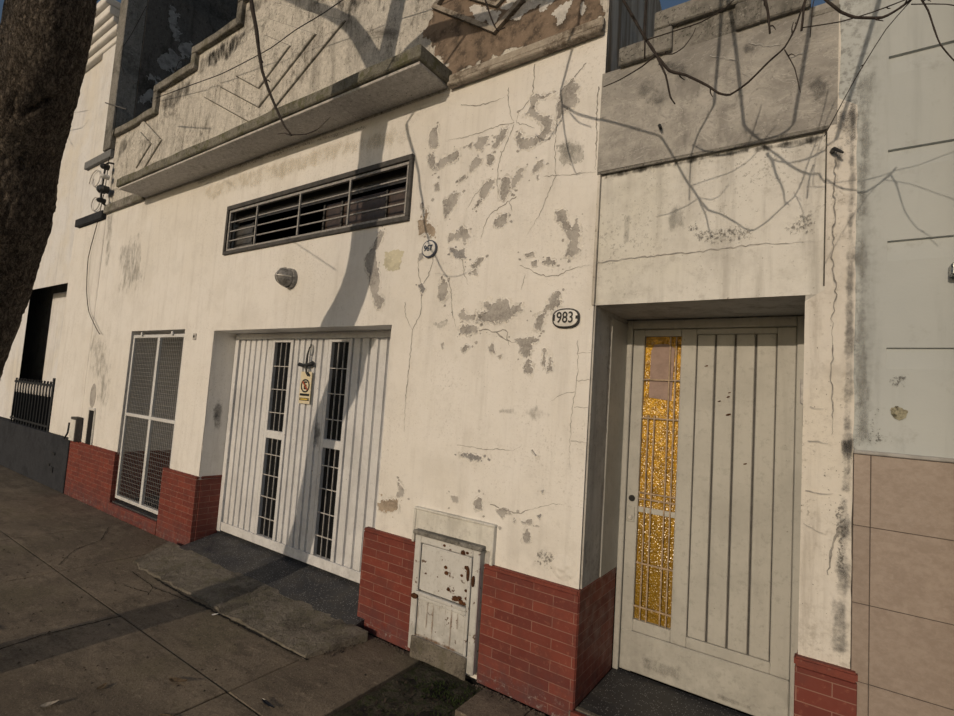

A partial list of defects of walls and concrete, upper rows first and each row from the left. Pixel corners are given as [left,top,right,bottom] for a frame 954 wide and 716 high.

peeling [138,5,193,104]
peeling [422,0,605,74]
peeling [416,77,584,276]
crack [457,63,600,236]
peeling [363,226,404,313]
crack [404,251,514,428]
peeling [416,274,565,379]
crack [552,340,589,465]
peeling [376,476,410,516]
damp [836,507,849,587]